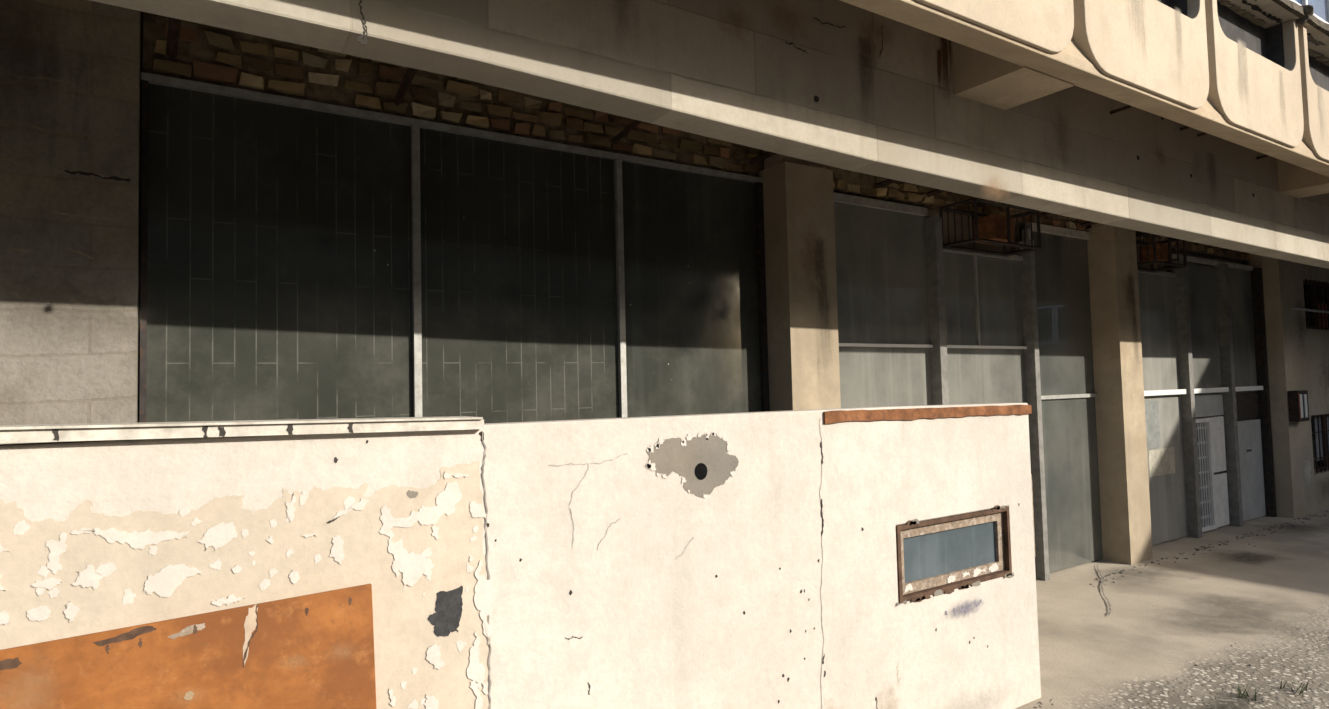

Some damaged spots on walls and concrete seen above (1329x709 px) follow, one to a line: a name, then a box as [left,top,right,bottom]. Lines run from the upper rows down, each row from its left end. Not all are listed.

peeling [0,461,497,709]